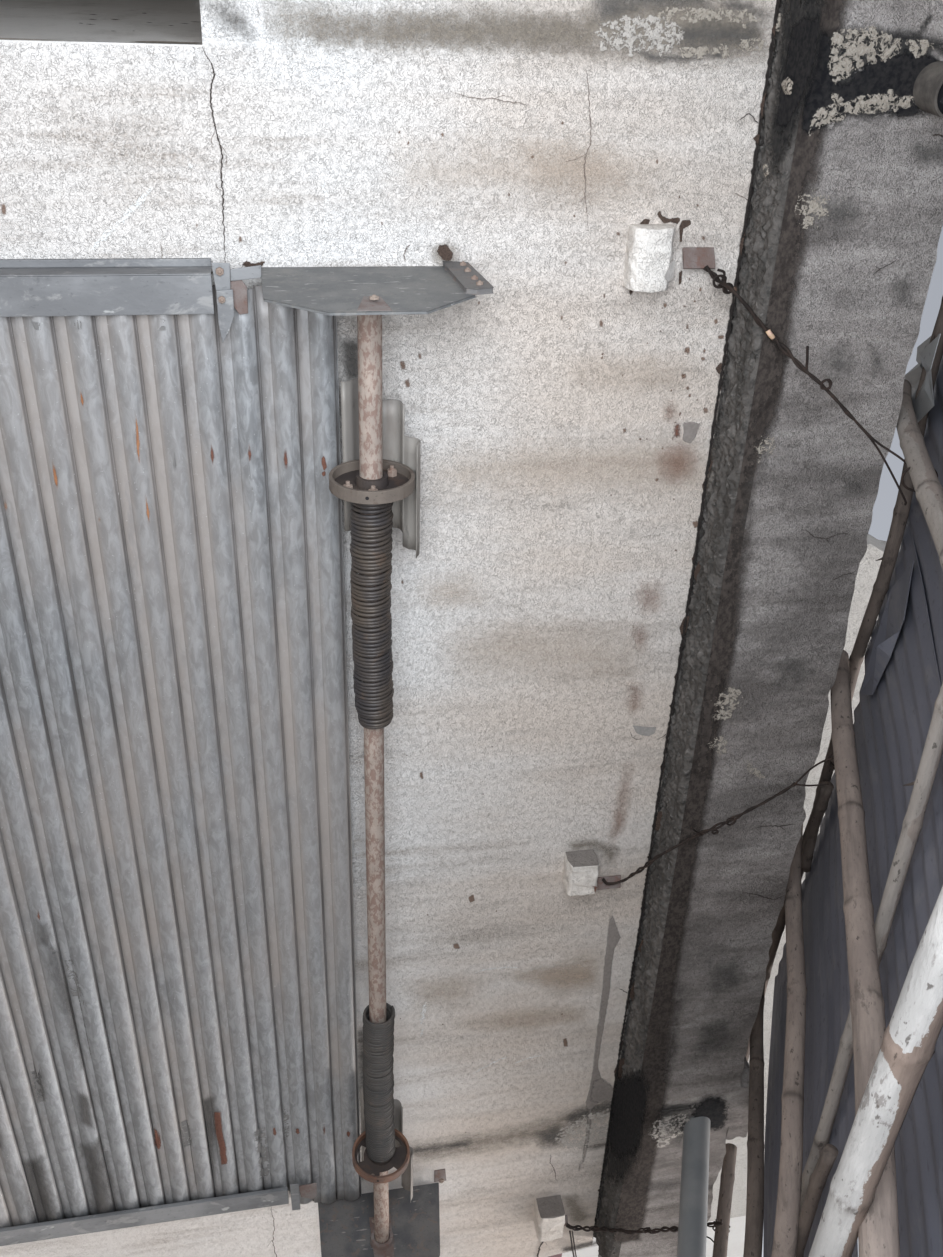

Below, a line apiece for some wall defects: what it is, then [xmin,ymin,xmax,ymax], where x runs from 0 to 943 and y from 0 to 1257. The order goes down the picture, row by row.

water stain [290,0,759,60]
crack [202,47,227,263]
water stain [415,0,943,1243]